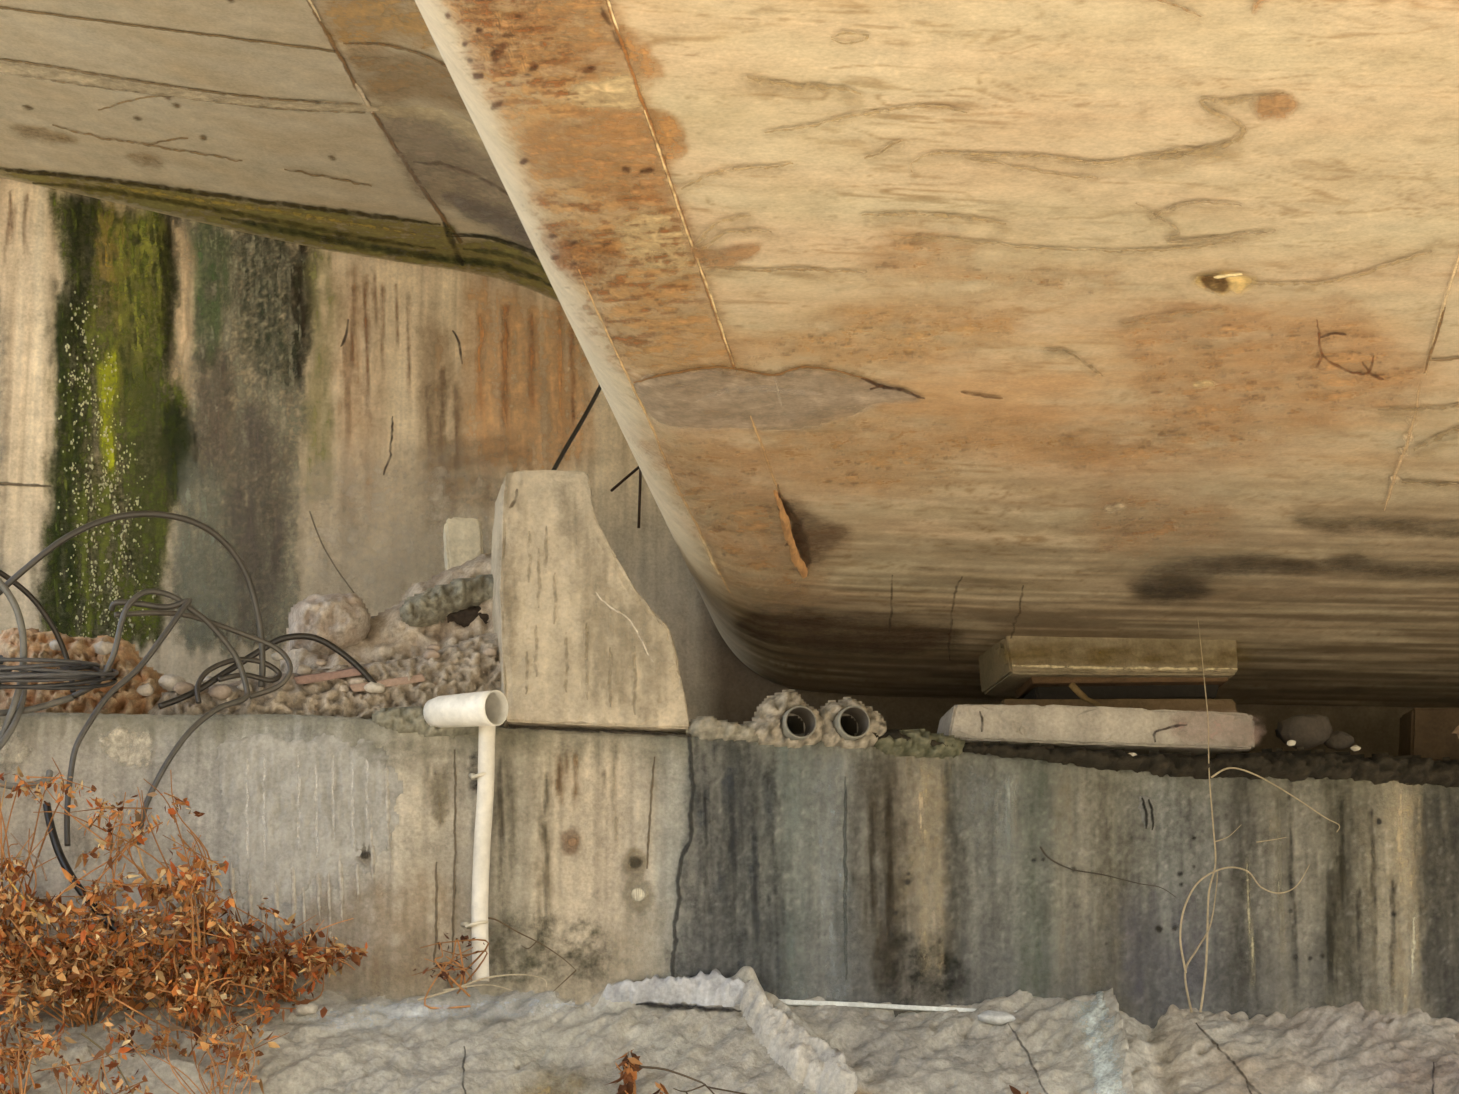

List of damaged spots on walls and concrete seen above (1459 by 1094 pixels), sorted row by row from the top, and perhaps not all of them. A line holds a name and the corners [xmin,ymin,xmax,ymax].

damp [0,42,553,647]
damp [503,526,557,693]
damp [674,742,784,992]
damp [829,776,848,980]
damp [864,770,949,978]
damp [1236,853,1254,996]
damp [1327,781,1459,983]